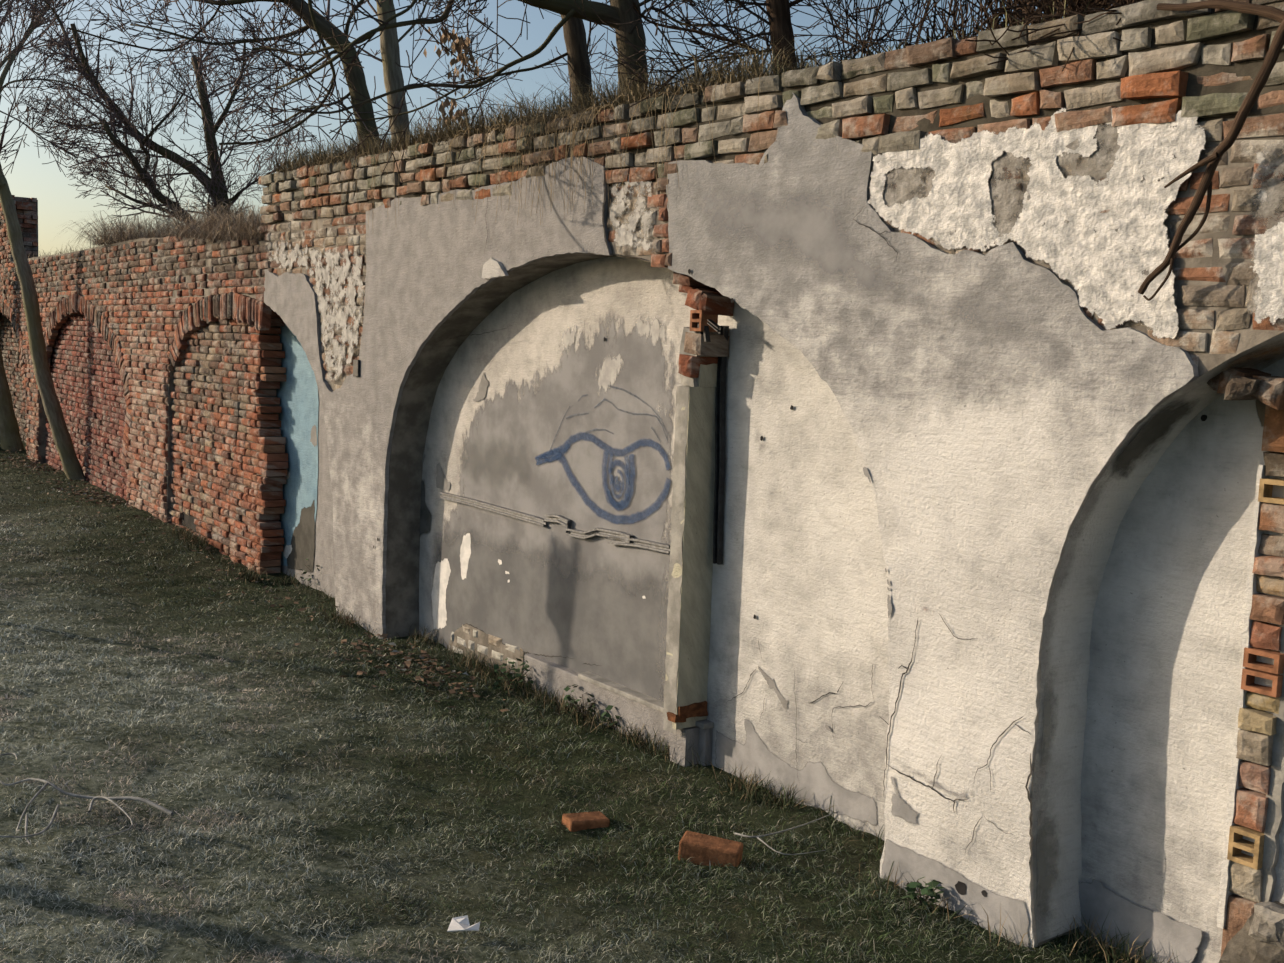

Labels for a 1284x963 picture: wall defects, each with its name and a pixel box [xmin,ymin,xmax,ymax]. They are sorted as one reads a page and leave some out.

flaking render [268,239,364,380]
flaking render [482,258,509,279]
flaking render [602,160,679,268]
flaking render [868,108,1206,339]
flaking render [1246,146,1284,325]
flaking render [422,315,675,680]
crack [728,614,1033,891]